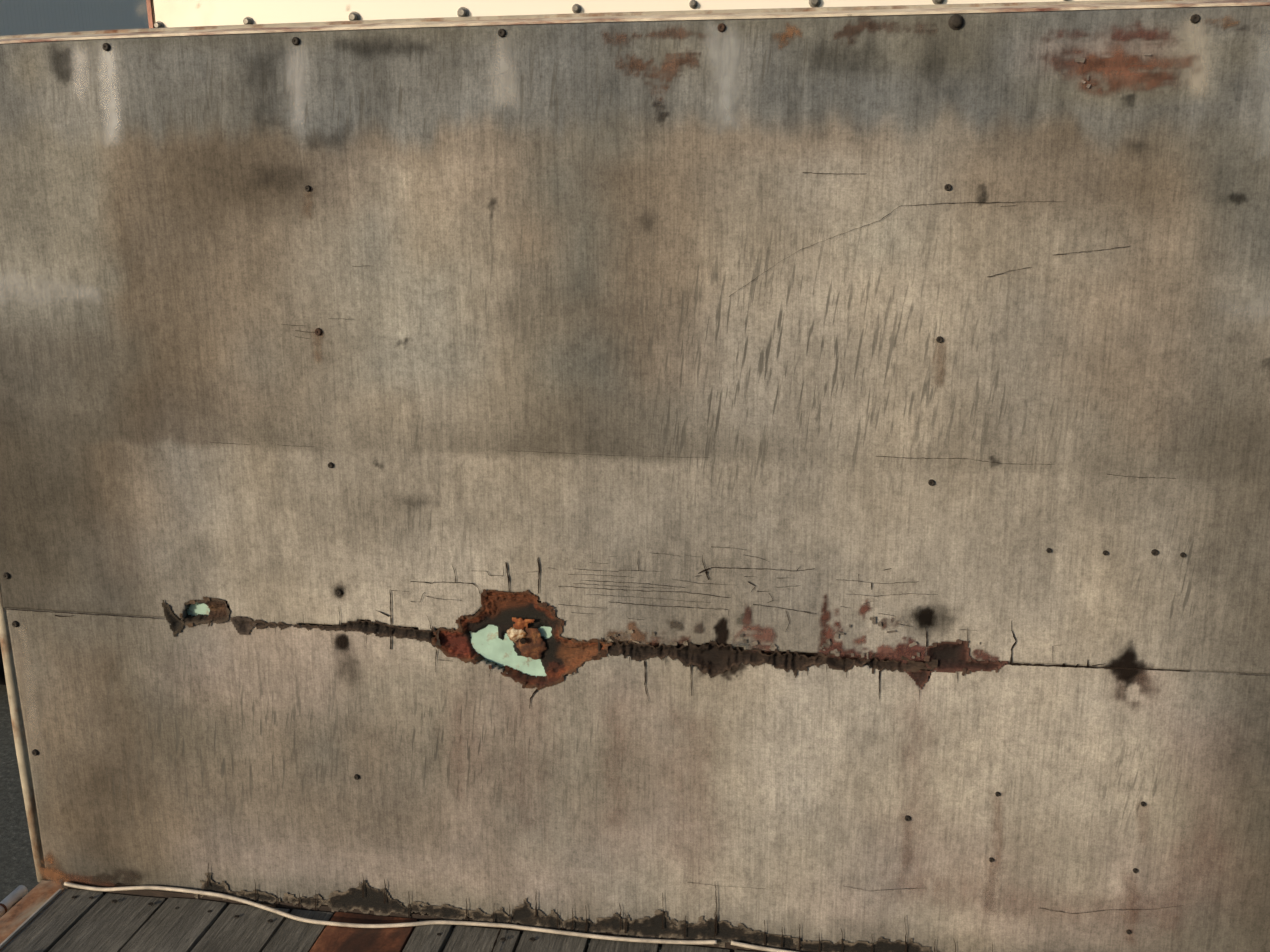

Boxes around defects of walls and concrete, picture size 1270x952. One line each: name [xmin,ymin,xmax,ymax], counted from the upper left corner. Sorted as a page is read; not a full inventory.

peeling [507,617,534,642]
crack [1005,645,1190,672]